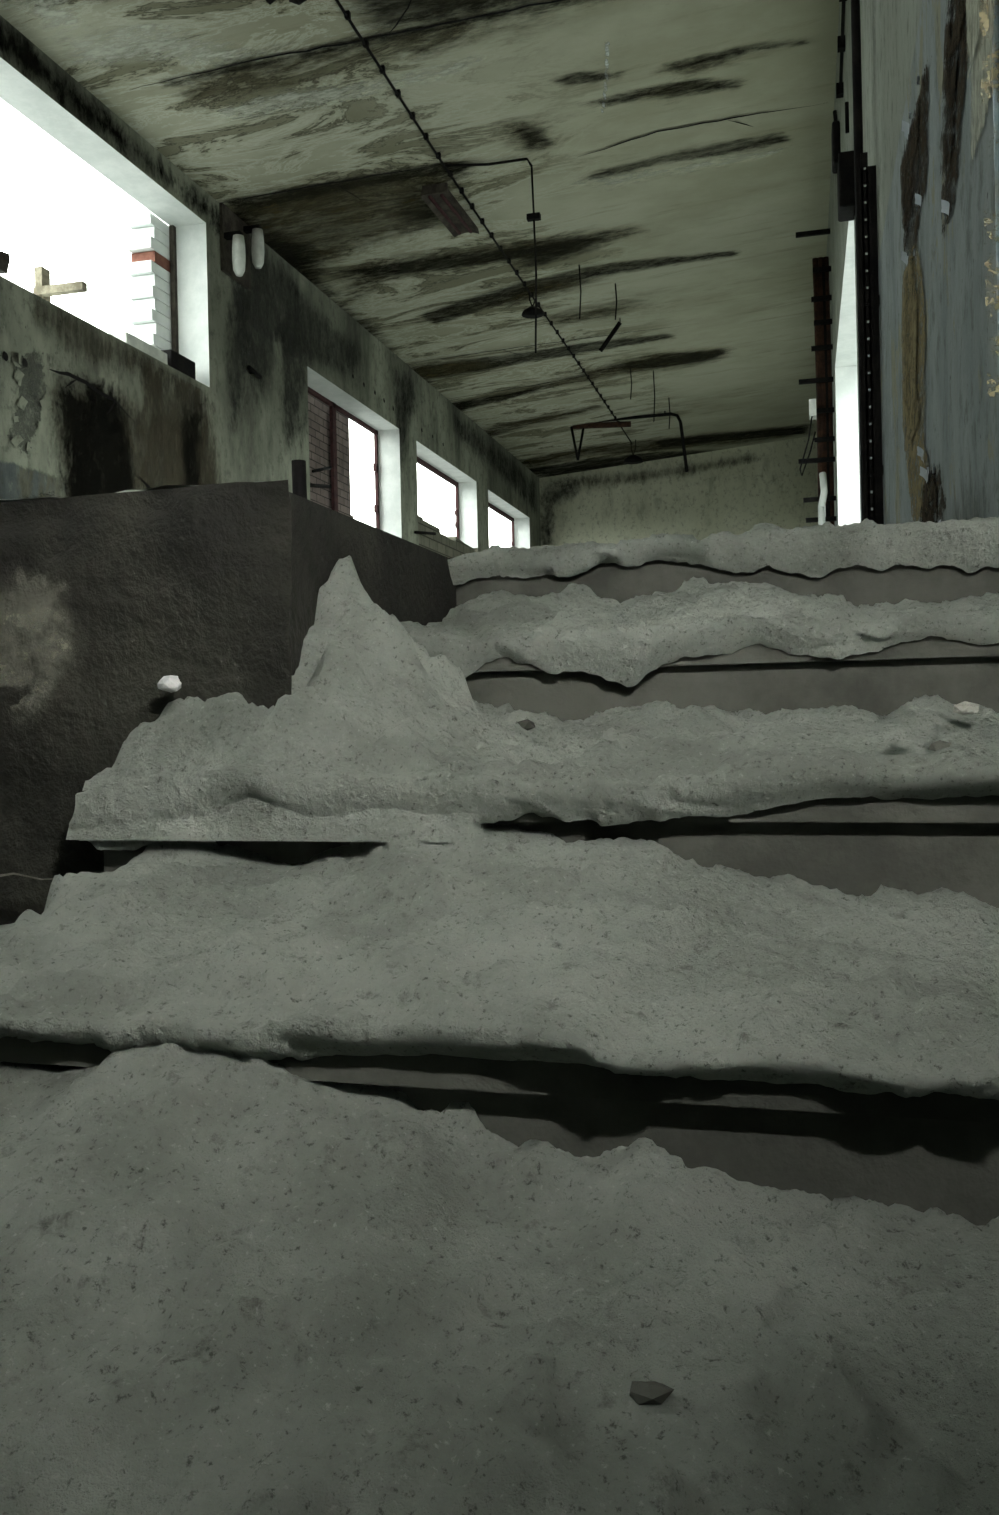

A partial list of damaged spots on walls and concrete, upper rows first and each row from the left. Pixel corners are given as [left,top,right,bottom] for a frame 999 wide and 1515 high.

leakage [75,0,579,118]
leakage [506,123,550,149]
leakage [556,42,776,113]
leakage [590,133,787,184]
leakage [227,162,738,446]
peeling [900,0,999,523]
peeling [7,352,53,455]
leakage [36,303,217,497]